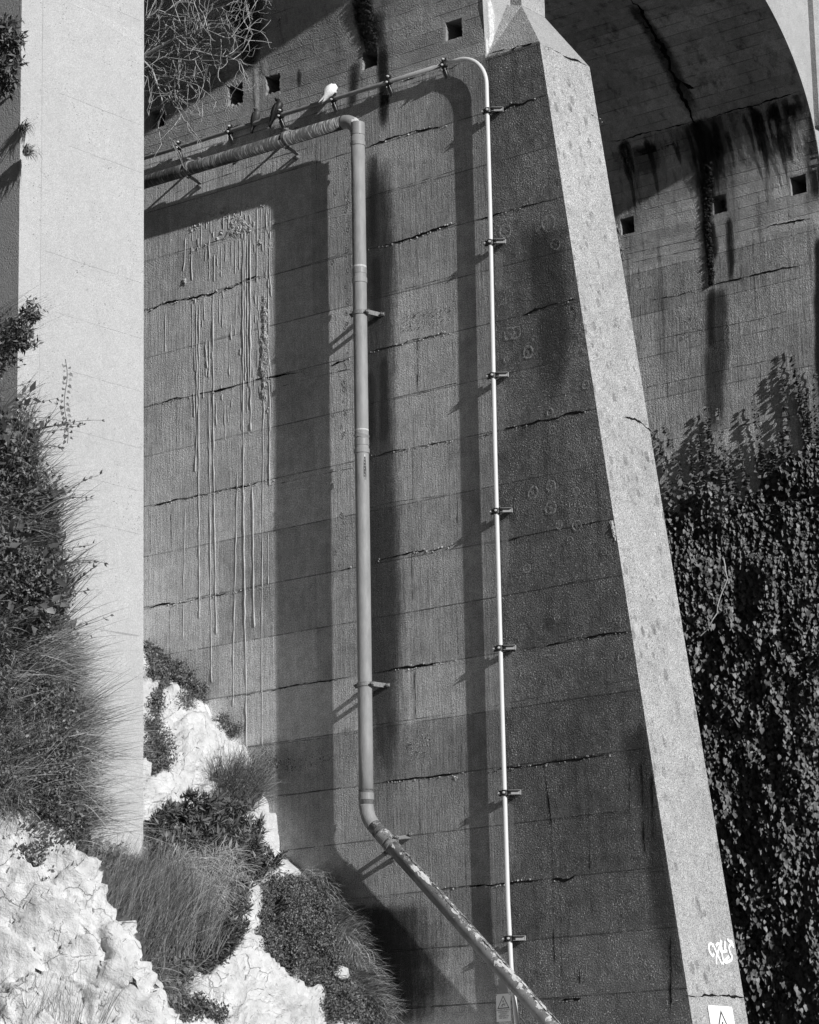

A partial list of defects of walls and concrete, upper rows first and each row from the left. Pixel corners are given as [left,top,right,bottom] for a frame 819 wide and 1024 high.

crack [366,125,447,148]
damp [619,95,819,280]
crack [368,199,554,250]
crack [145,275,267,311]
crack [478,408,596,438]
crack [157,475,294,505]
damp [183,193,272,747]
crack [380,754,654,1002]